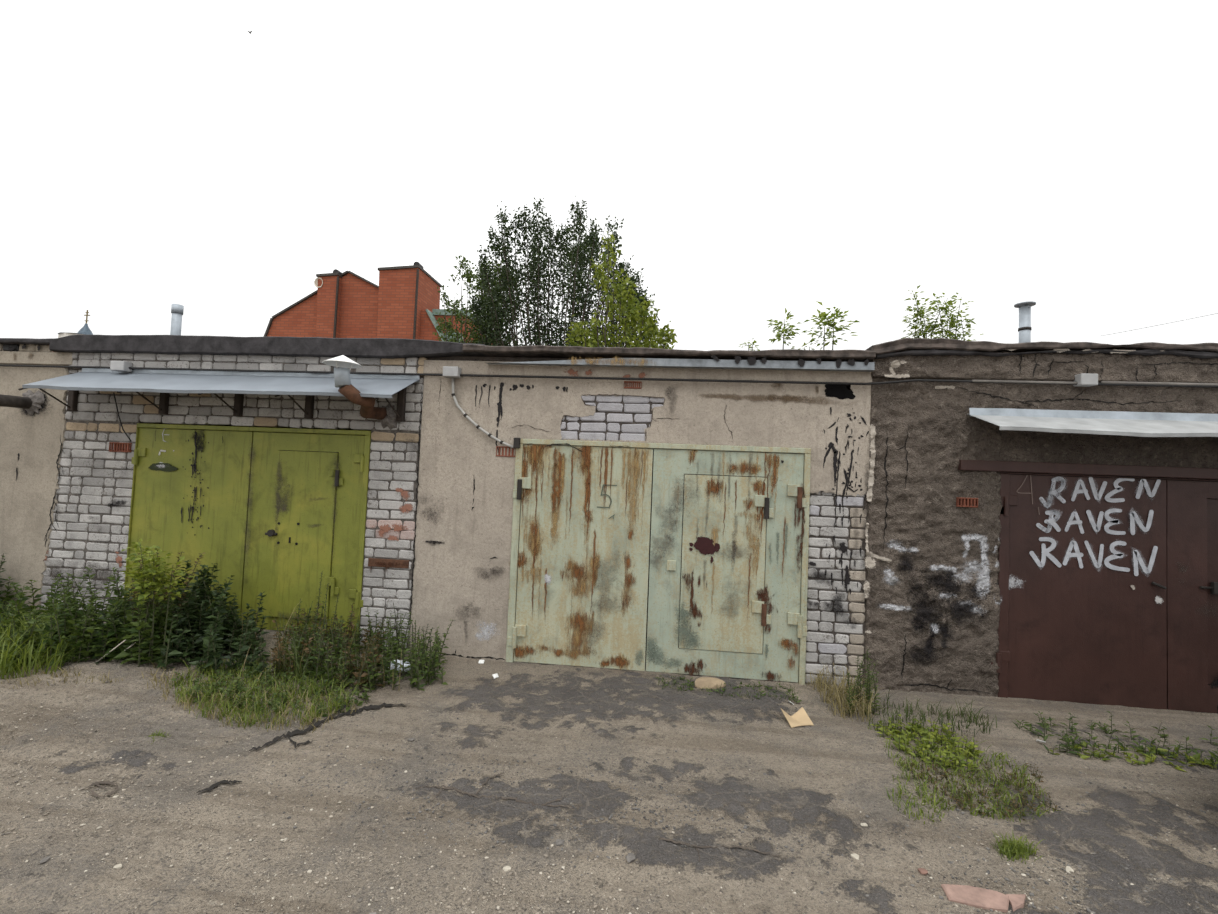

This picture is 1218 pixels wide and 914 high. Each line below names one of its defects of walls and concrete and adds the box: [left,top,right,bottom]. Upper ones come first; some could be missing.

spalling [824,384,856,400]
crack [963,351,1218,406]
flaking render [560,394,665,441]
rust [514,444,649,658]
rust [682,452,805,632]
rust [601,655,628,669]
rust [678,659,706,676]
rust [762,639,798,681]